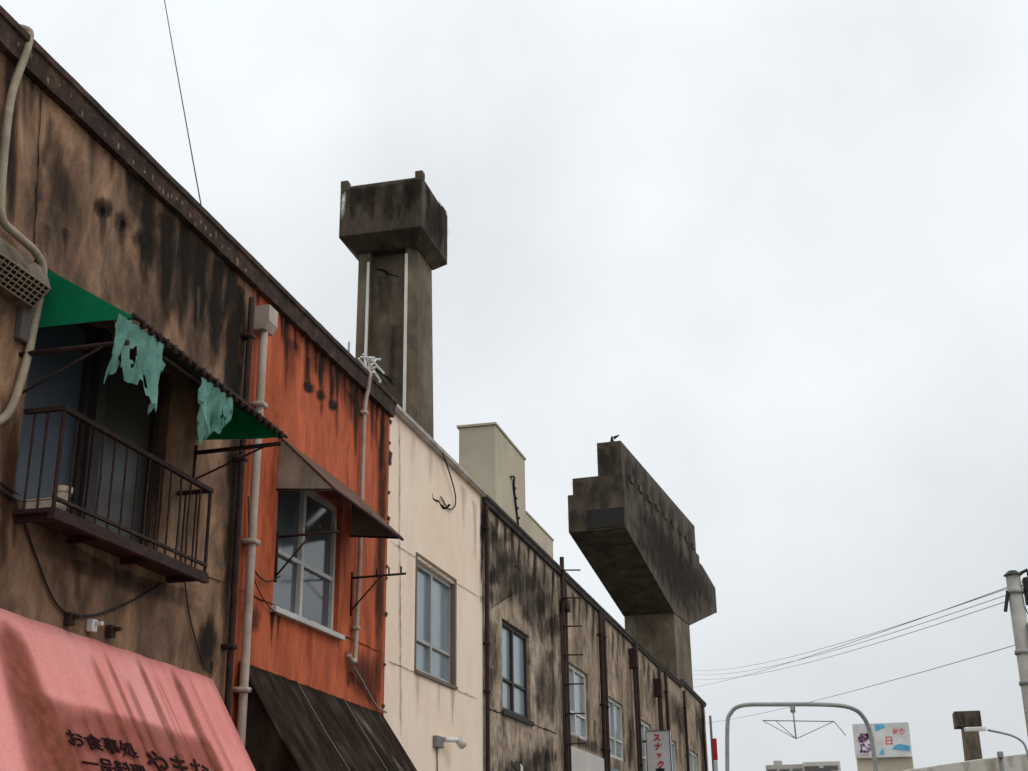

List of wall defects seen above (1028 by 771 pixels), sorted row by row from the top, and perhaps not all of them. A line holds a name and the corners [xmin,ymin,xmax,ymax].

damp [359,179,446,248]
damp [95,171,245,397]
damp [258,293,387,520]
crack [376,368,395,388]
damp [199,452,238,675]
crack [208,519,504,727]
damp [376,538,385,635]
damp [481,502,554,637]
damp [599,446,712,612]
damp [507,751,556,771]
damp [673,698,704,771]